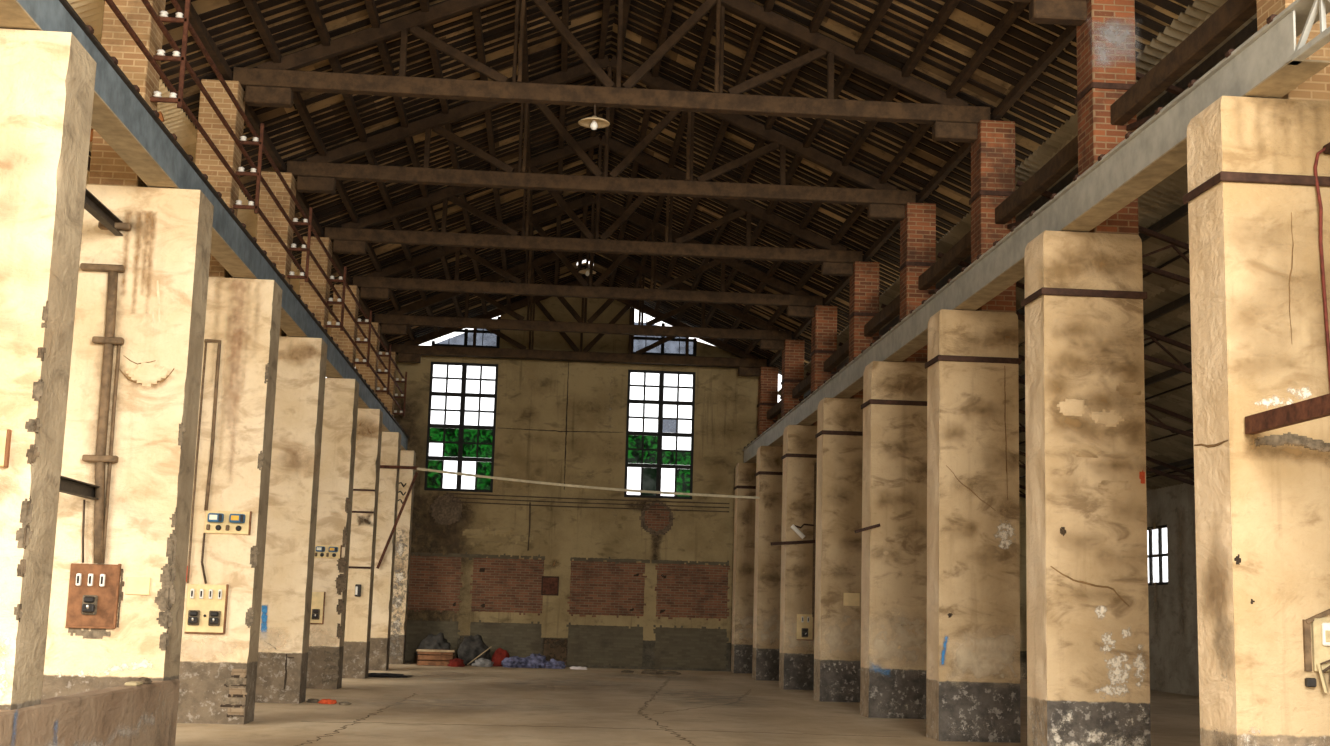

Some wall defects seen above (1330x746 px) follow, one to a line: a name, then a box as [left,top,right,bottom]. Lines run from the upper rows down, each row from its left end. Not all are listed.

water stain [122,213,155,286]
crack [1287,212,1295,341]
flaking render [32,379,44,402]
flaking render [25,418,42,466]
flaking render [1248,432,1330,460]
flaking render [15,496,33,577]
flaking render [14,604,22,622]
flaking render [68,569,125,639]
flaking render [154,507,233,658]
crack [1050,566,1129,606]
peeling [1095,606,1146,696]
efflorescence [1031,704,1146,746]